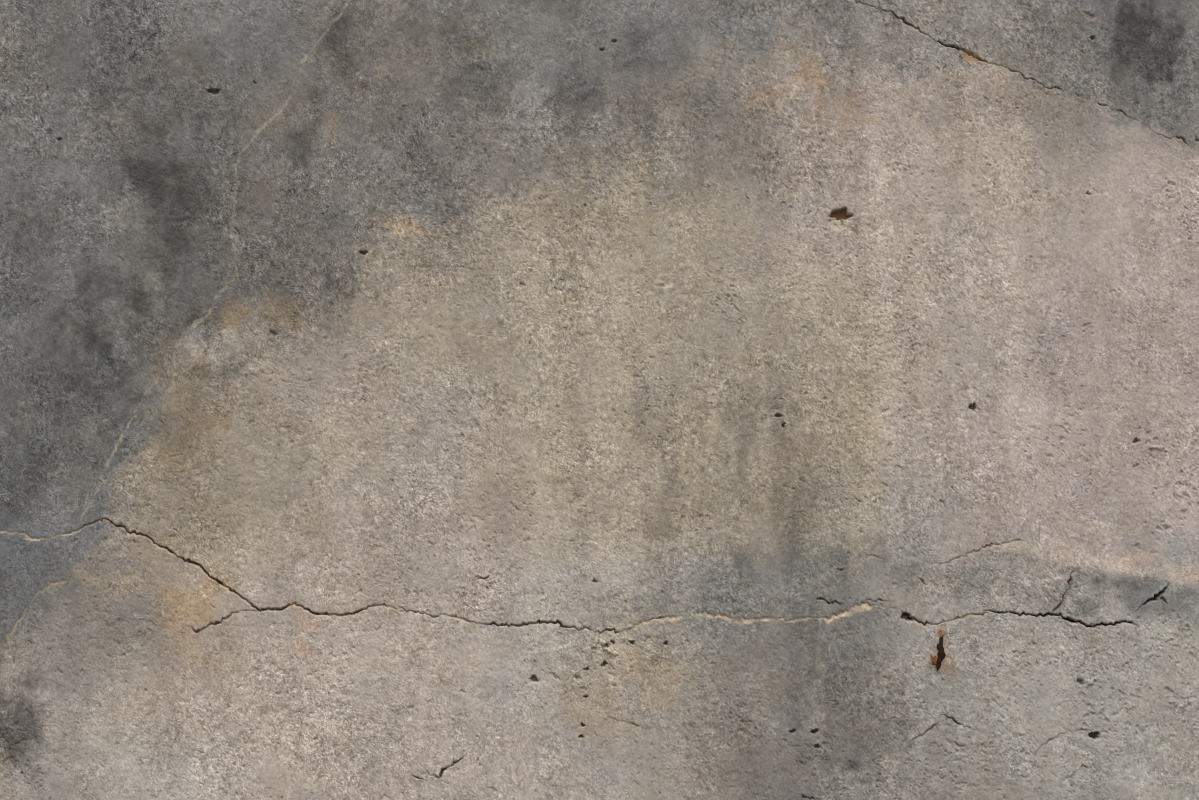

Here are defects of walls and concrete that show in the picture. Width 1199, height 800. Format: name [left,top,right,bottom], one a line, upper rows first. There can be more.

crack [0,0,1199,636]
rust [922,623,959,687]